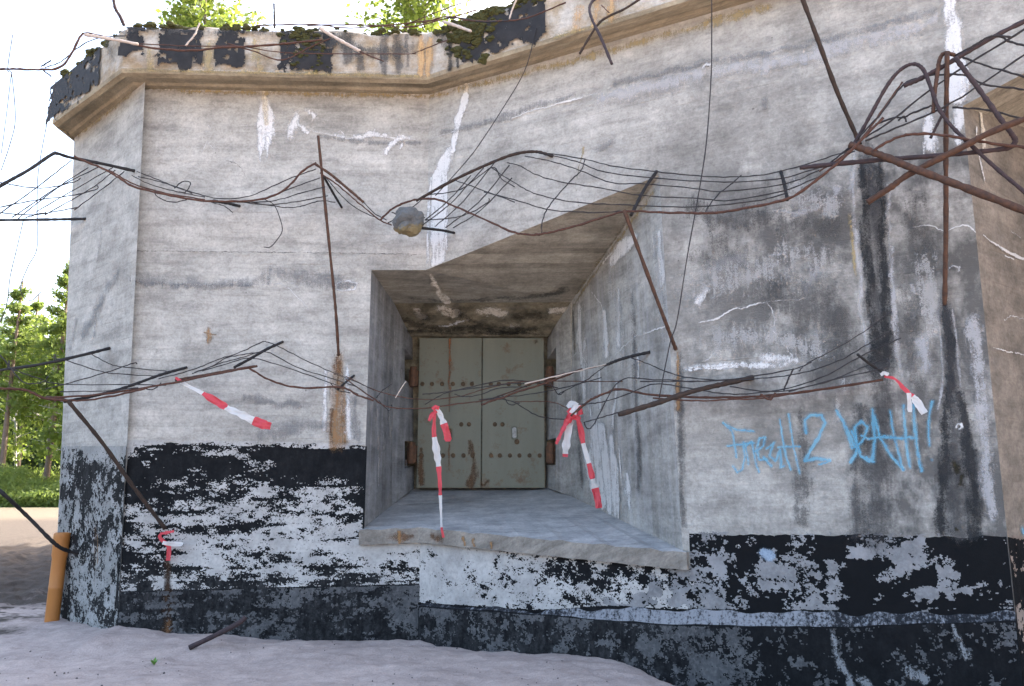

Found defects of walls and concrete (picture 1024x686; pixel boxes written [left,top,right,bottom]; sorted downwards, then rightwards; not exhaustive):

water stain [123,28,419,78]
water stain [439,33,459,71]
corrosion [321,357,355,450]
water stain [403,83,641,519]
water stain [653,143,996,547]
peeling [57,440,1024,686]